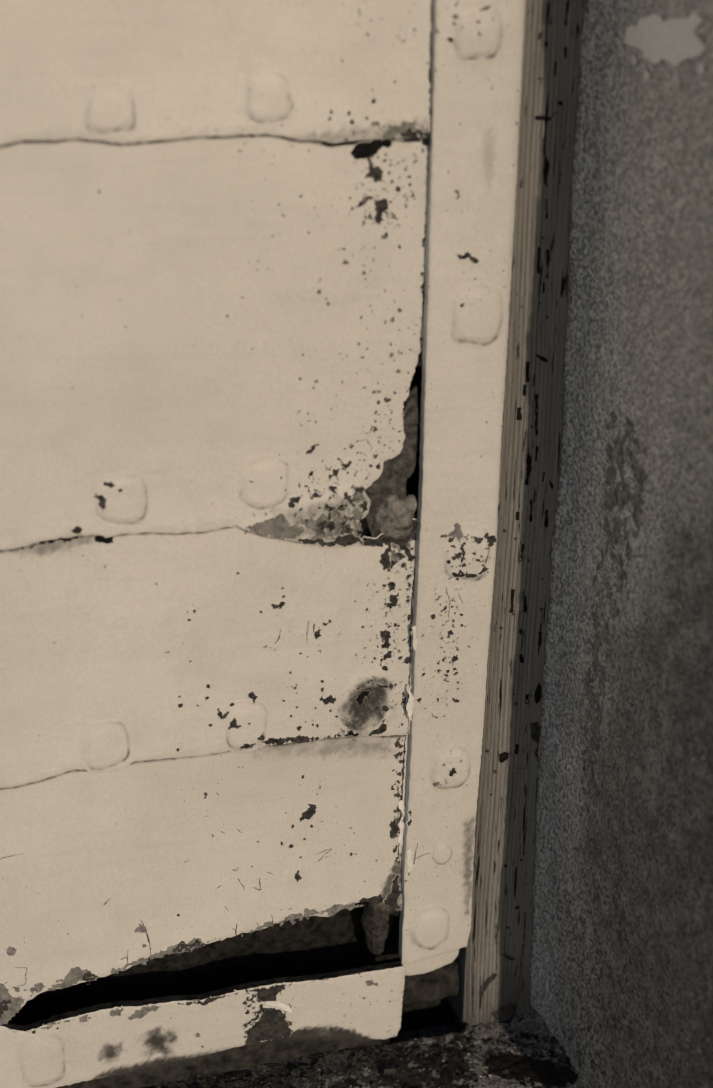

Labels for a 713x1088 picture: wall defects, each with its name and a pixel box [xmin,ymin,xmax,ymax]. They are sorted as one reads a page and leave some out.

peeling [345,118,431,250]
peeling [246,459,369,547]
corrosion [291,385,419,664]
corrosion [431,522,497,702]
corrosion [240,707,369,749]
corrosion [340,676,407,958]
peeling [0,945,62,1034]
corrosion [5,979,90,1001]
peeling [52,966,100,989]
peeling [121,936,222,970]
peeling [177,982,292,1045]
peeling [249,893,384,933]